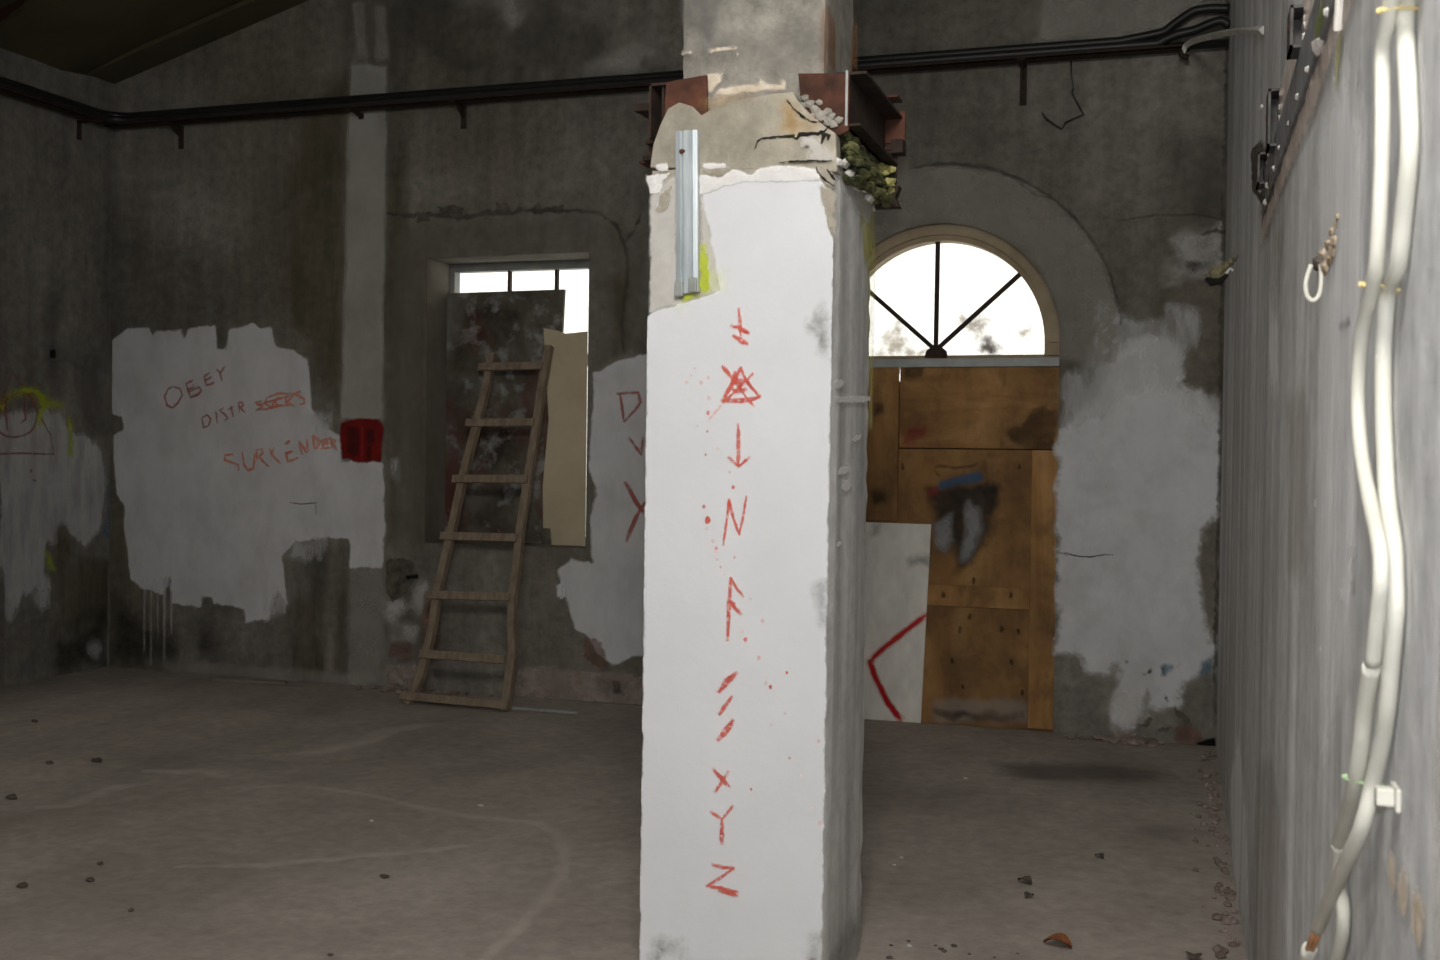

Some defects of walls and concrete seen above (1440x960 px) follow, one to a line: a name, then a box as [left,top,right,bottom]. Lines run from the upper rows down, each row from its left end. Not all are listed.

flaking render [647,164,672,212]
flaking render [699,163,820,194]
spalling [836,132,896,213]